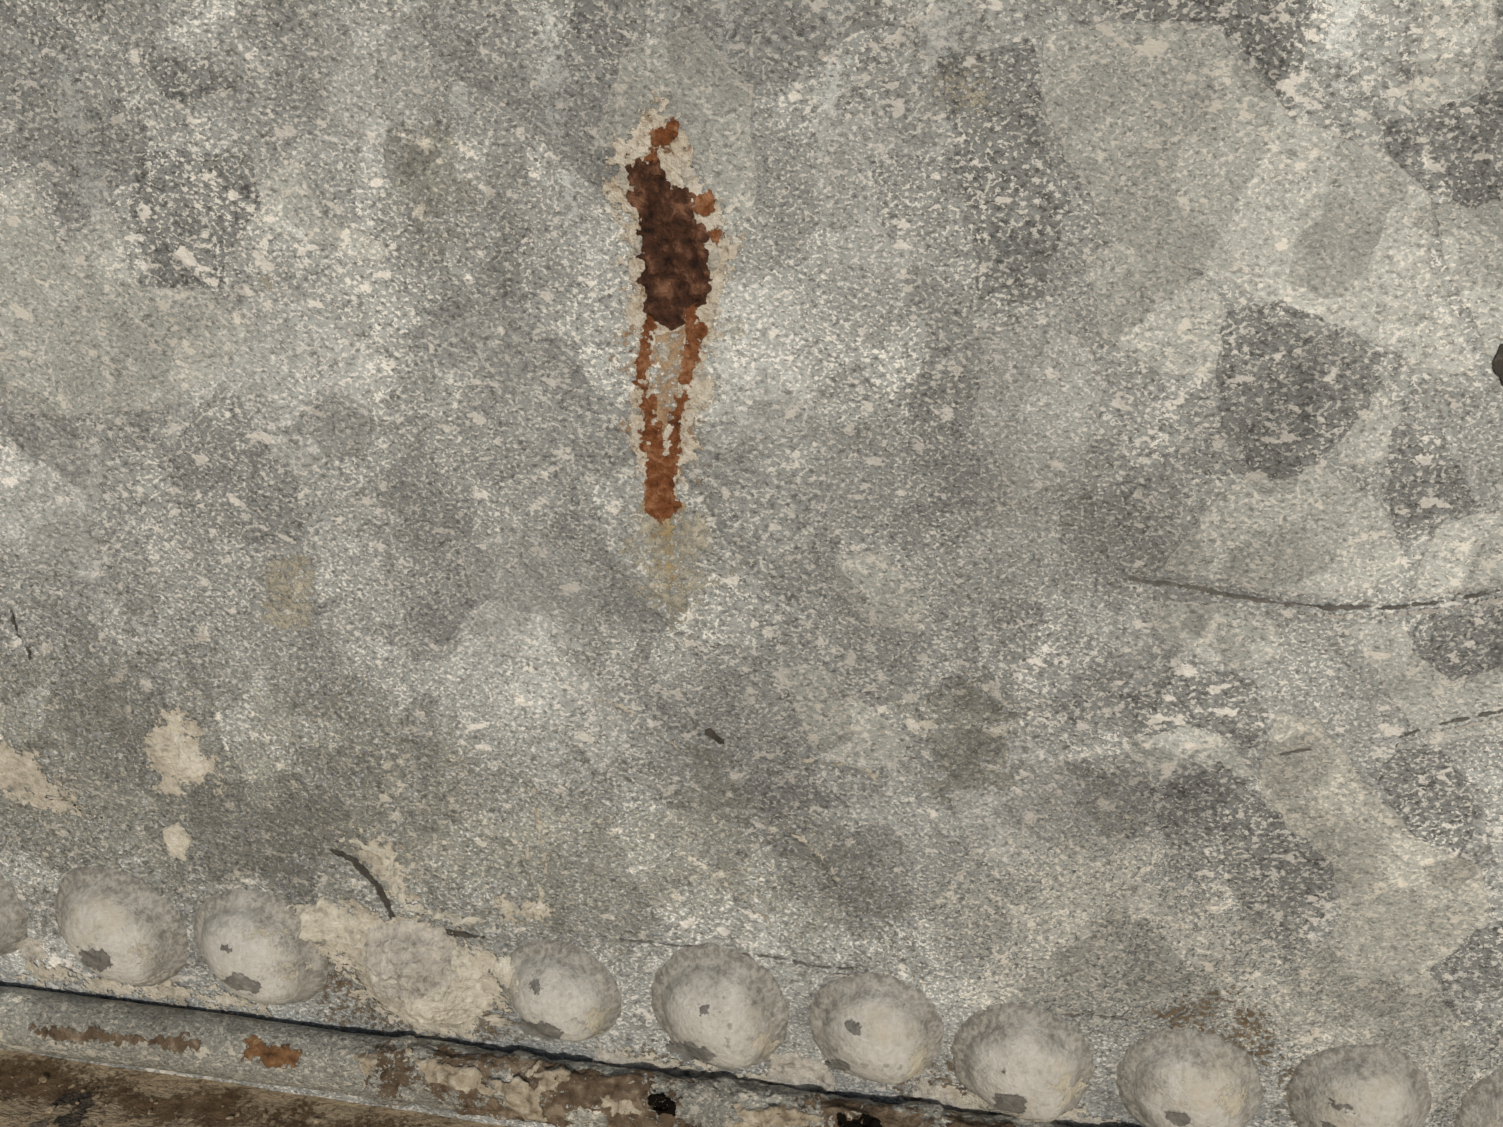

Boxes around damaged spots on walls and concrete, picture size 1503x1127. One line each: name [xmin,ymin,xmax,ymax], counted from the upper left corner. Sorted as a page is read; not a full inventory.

rust [602,90,755,653]
peeling [0,719,97,823]
peeling [137,707,226,799]
peeling [299,896,488,1025]
rust [28,1023,201,1055]
rust [234,1035,303,1069]
rust [346,1039,703,1127]
rust [777,1093,1015,1127]